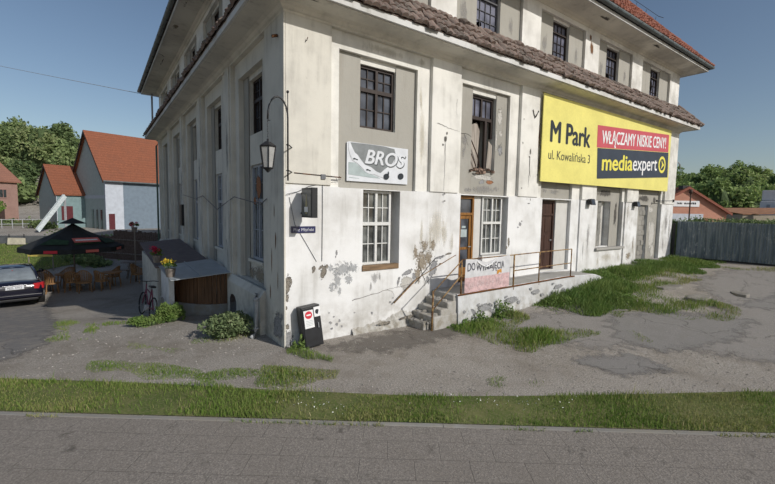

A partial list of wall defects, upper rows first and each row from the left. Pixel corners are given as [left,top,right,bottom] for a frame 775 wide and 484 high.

peeling [312,250,357,294]
crack [352,256,442,301]
peeling [397,269,416,291]
spalling [426,252,451,284]
spalling [273,275,294,347]